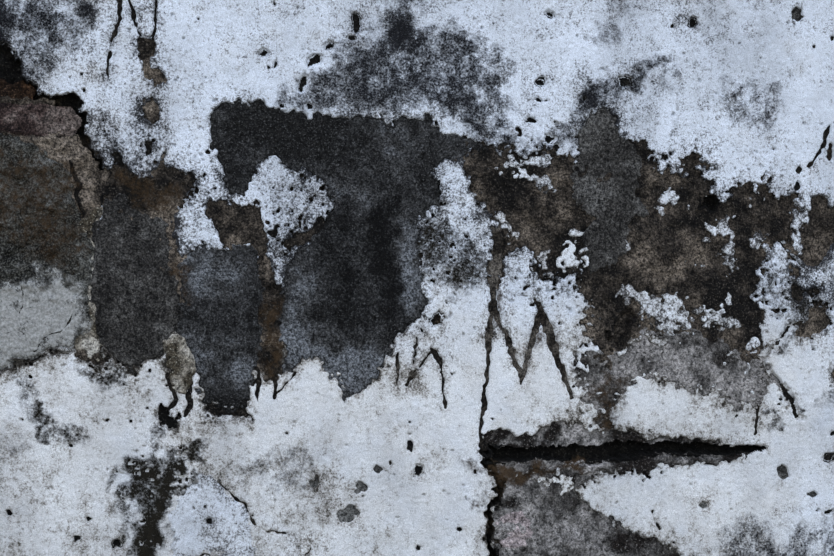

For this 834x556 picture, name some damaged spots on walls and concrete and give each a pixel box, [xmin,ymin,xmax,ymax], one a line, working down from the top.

leakage [0,0,98,81]
leakage [276,0,681,157]
spalling [0,38,834,448]
leakage [106,456,131,543]
spalling [337,504,360,523]
spalling [354,481,368,497]
spalling [485,452,751,556]
crack [479,439,766,556]
spalling [777,464,789,480]